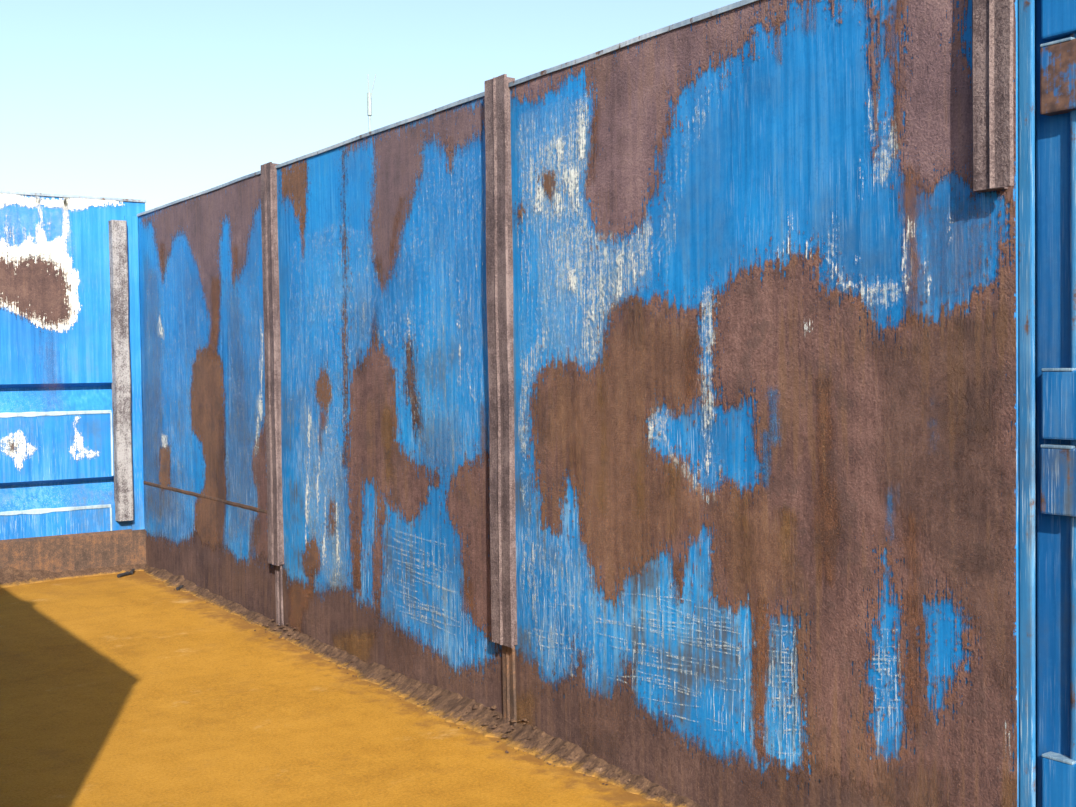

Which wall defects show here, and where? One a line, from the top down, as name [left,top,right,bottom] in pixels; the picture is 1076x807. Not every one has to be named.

peeling [0,193,125,333]
peeling [519,101,660,365]
peeling [6,431,32,468]
peeling [73,417,83,449]
rust [141,98,503,714]
rust [511,0,1017,807]